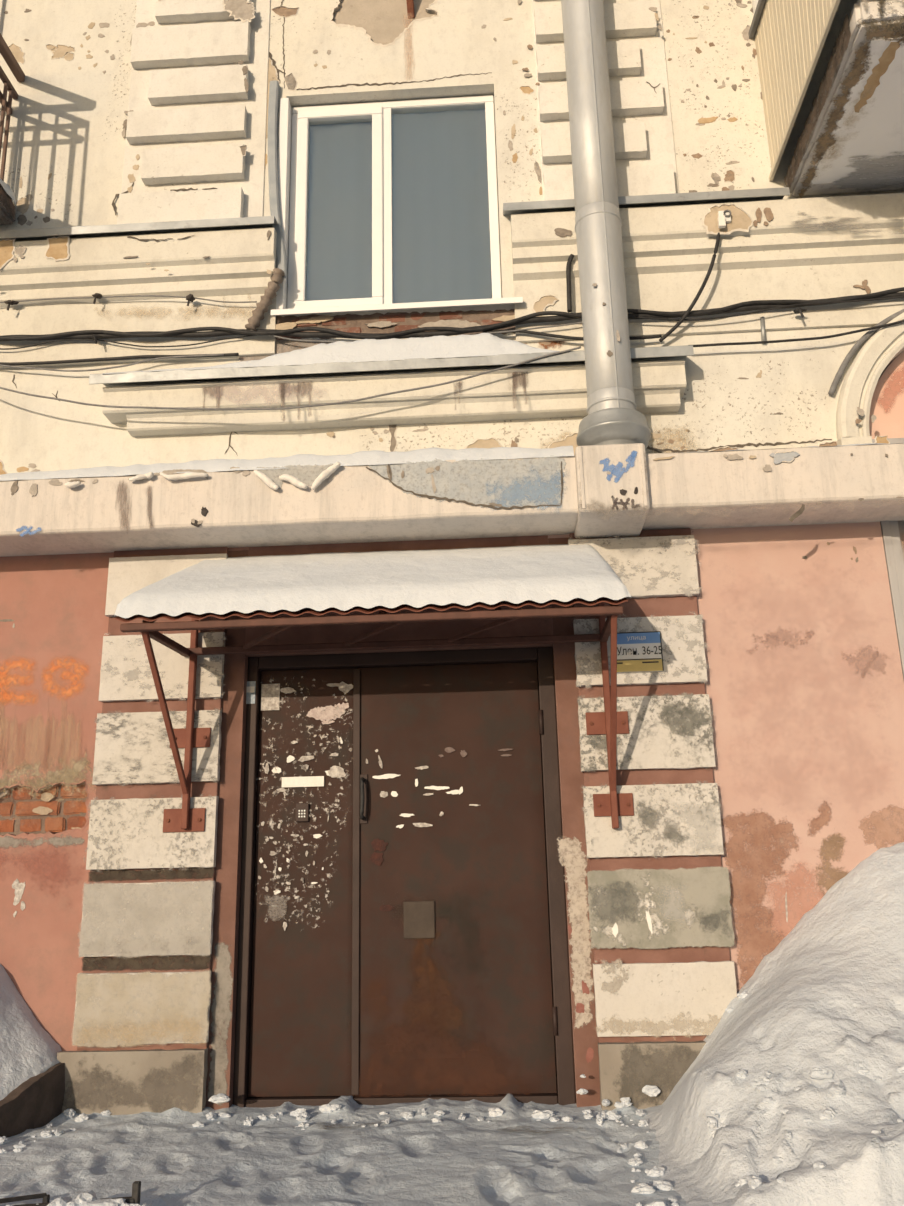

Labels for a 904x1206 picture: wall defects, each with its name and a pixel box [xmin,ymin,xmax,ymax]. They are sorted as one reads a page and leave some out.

crack [269,0,491,90]
flaking render [330,0,439,47]
flaking render [649,0,774,235]
flaking render [853,40,901,114]
flaking render [0,169,71,269]
water stain [279,382,310,421]
peeling [362,419,578,509]
water stain [513,372,527,408]
crack [647,439,832,453]
flaking render [0,763,150,871]
spalling [12,879,26,917]
peeling [557,781,848,1028]